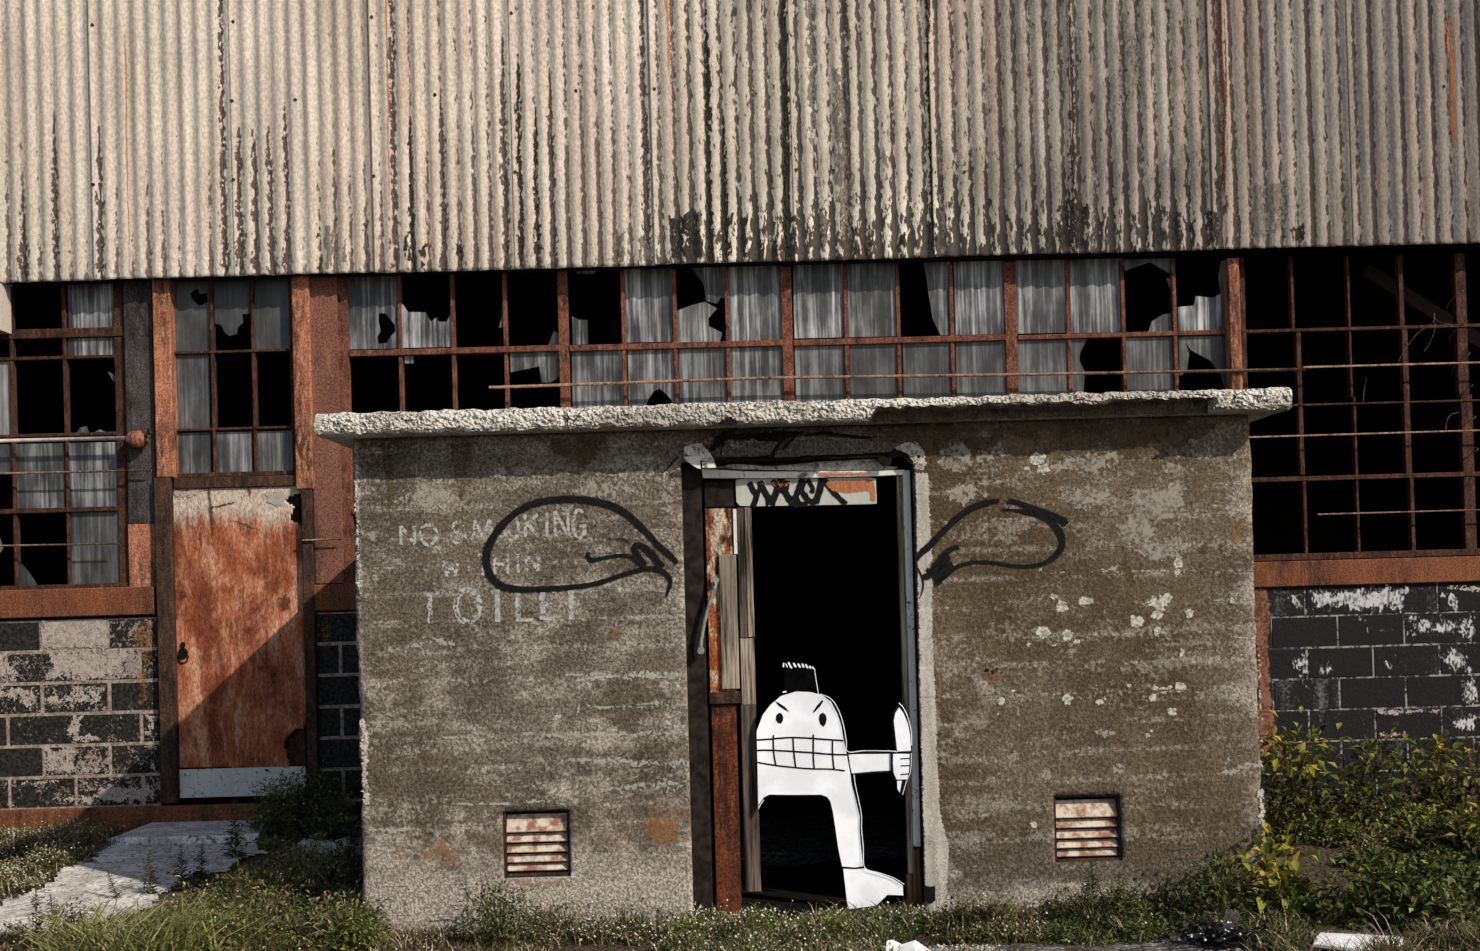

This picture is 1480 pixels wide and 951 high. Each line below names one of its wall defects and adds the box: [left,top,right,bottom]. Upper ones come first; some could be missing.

corrosion [665,0,673,95]
corrosion [1216,0,1229,192]
corrosion [1446,14,1458,148]
corrosion [208,487,255,536]
peeling [0,619,157,805]
corrosion [278,594,291,611]
peeling [684,394,1213,913]
peeling [1377,708,1440,737]